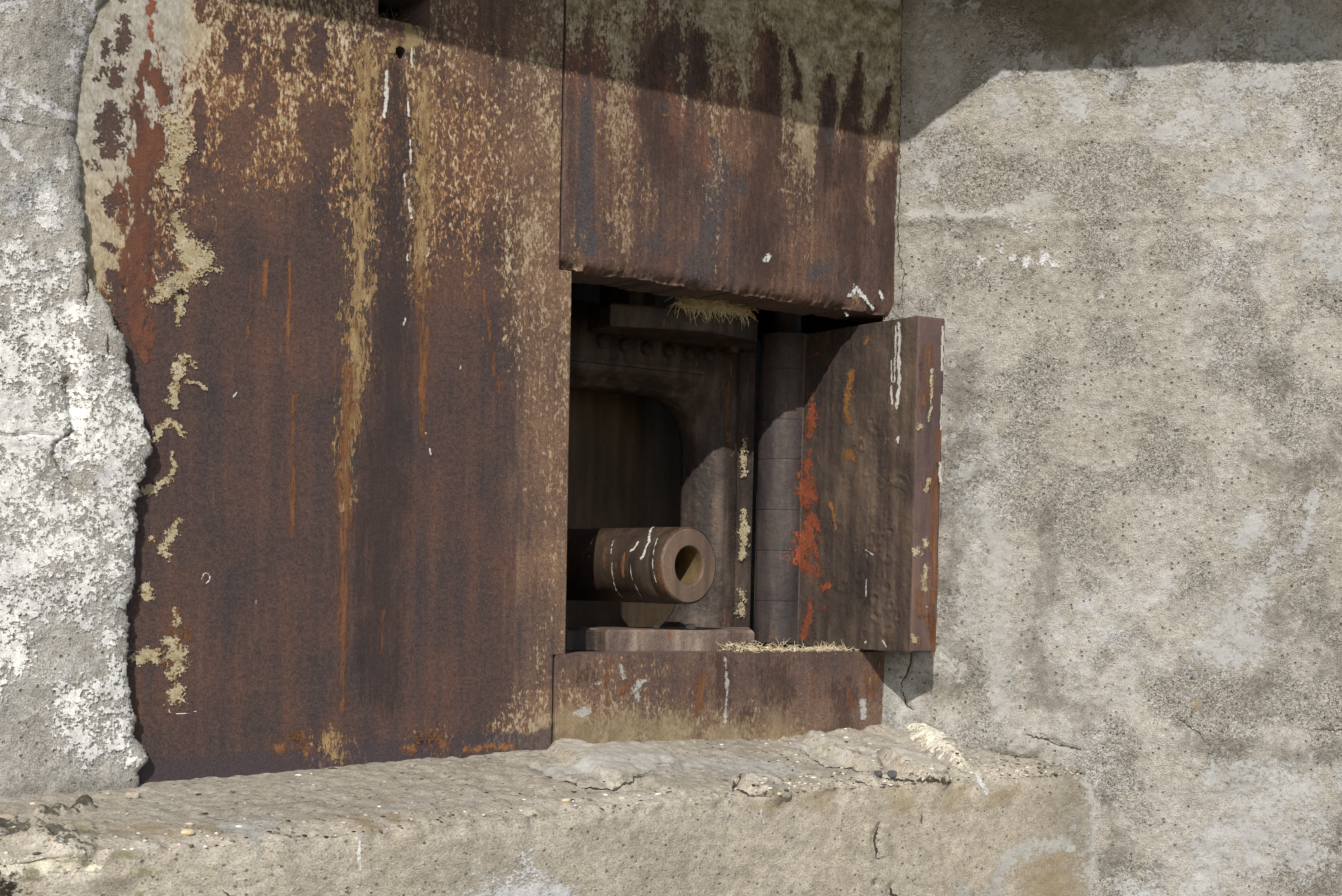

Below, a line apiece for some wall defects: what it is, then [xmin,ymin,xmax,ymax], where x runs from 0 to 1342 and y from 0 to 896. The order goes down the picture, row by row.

damp [0,0,29,14]
damp [0,78,151,771]
damp [62,0,97,75]
corrosion [85,0,174,364]
corrosion [331,23,423,713]
corrosion [407,69,438,444]
corrosion [782,392,837,642]
damp [847,286,884,309]
corrosion [911,428,945,656]
damp [905,0,1342,290]
crack [732,773,771,797]
crack [804,749,952,823]